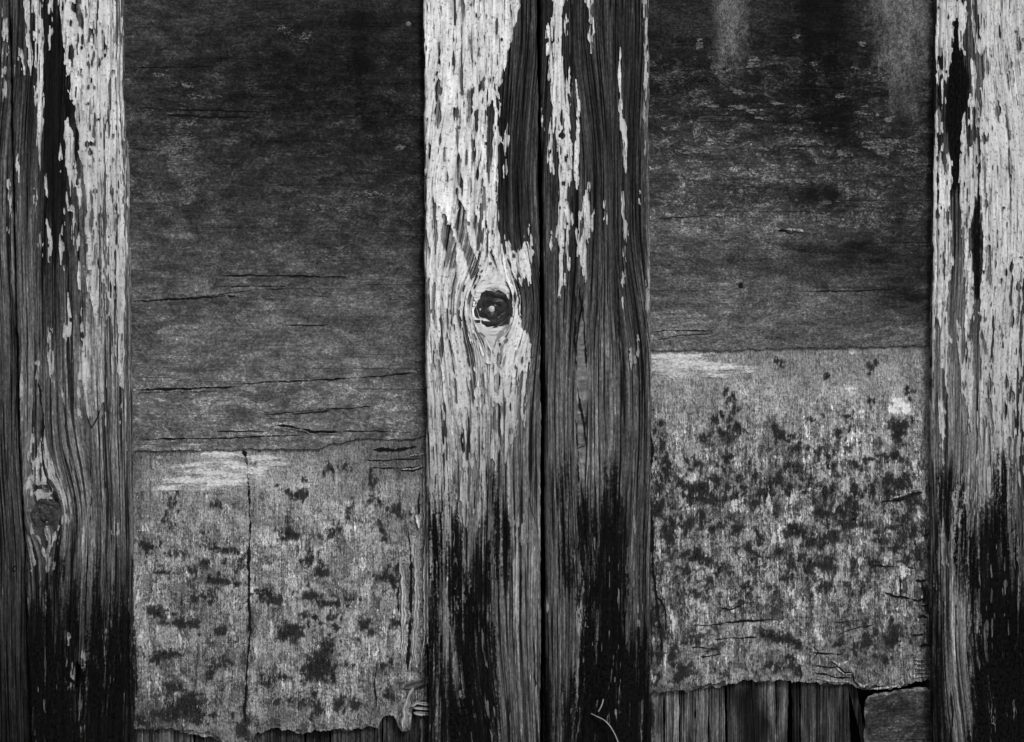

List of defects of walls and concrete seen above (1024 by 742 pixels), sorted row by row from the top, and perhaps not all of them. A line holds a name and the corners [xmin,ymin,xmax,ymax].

peeling [1,0,129,426]
damp [24,467,412,742]
crack [136,274,344,302]
crack [139,372,418,392]
crack [146,406,424,722]
damp [322,461,353,481]
peeling [423,0,534,700]
peeling [541,0,608,297]
peeling [618,47,627,173]
peeling [629,262,650,371]
damp [650,386,1024,742]
peeling [931,0,1024,730]